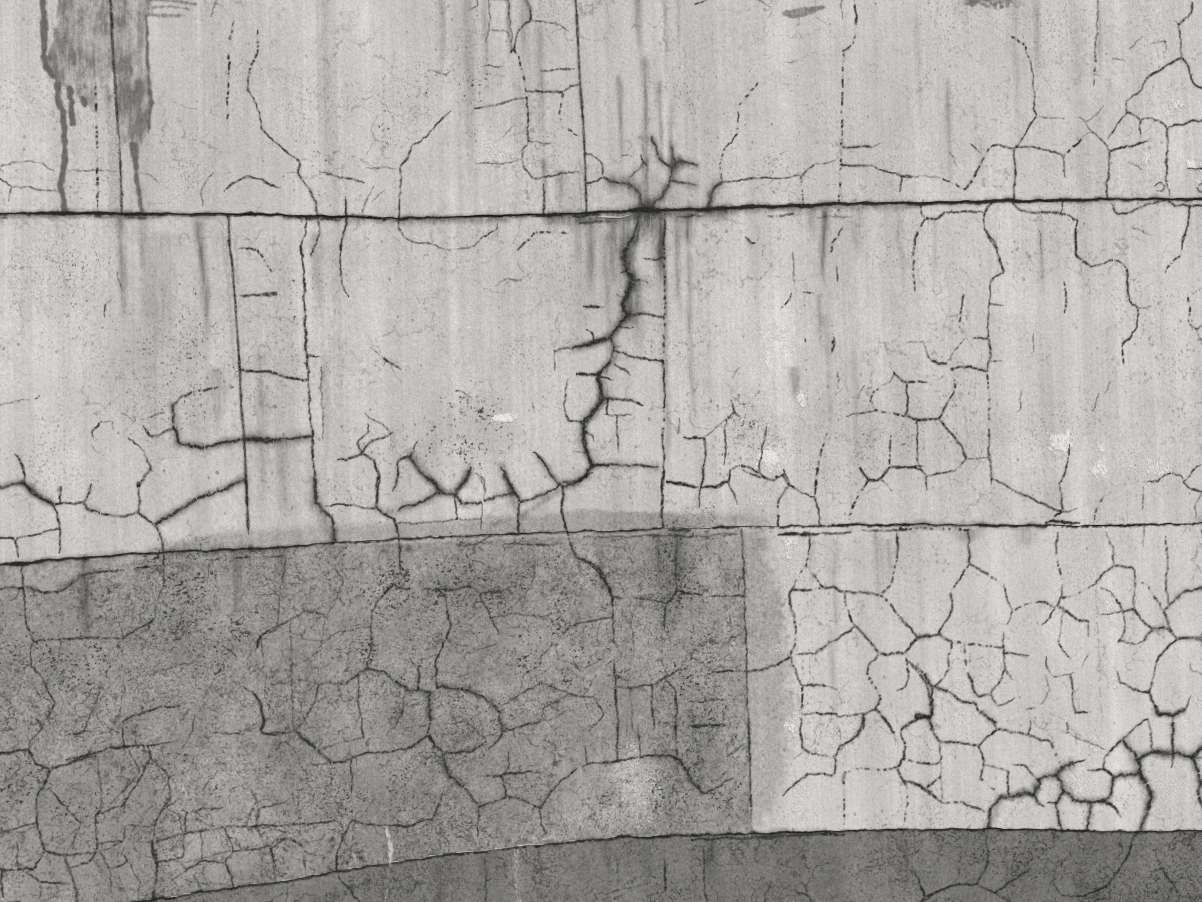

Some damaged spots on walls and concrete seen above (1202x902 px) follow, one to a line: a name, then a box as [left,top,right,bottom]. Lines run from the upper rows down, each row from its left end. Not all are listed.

crack [0,0,1202,643]
crack [30,618,155,732]
crack [222,611,324,657]
crack [244,371,1202,902]
crack [0,706,178,901]
crack [130,793,487,902]